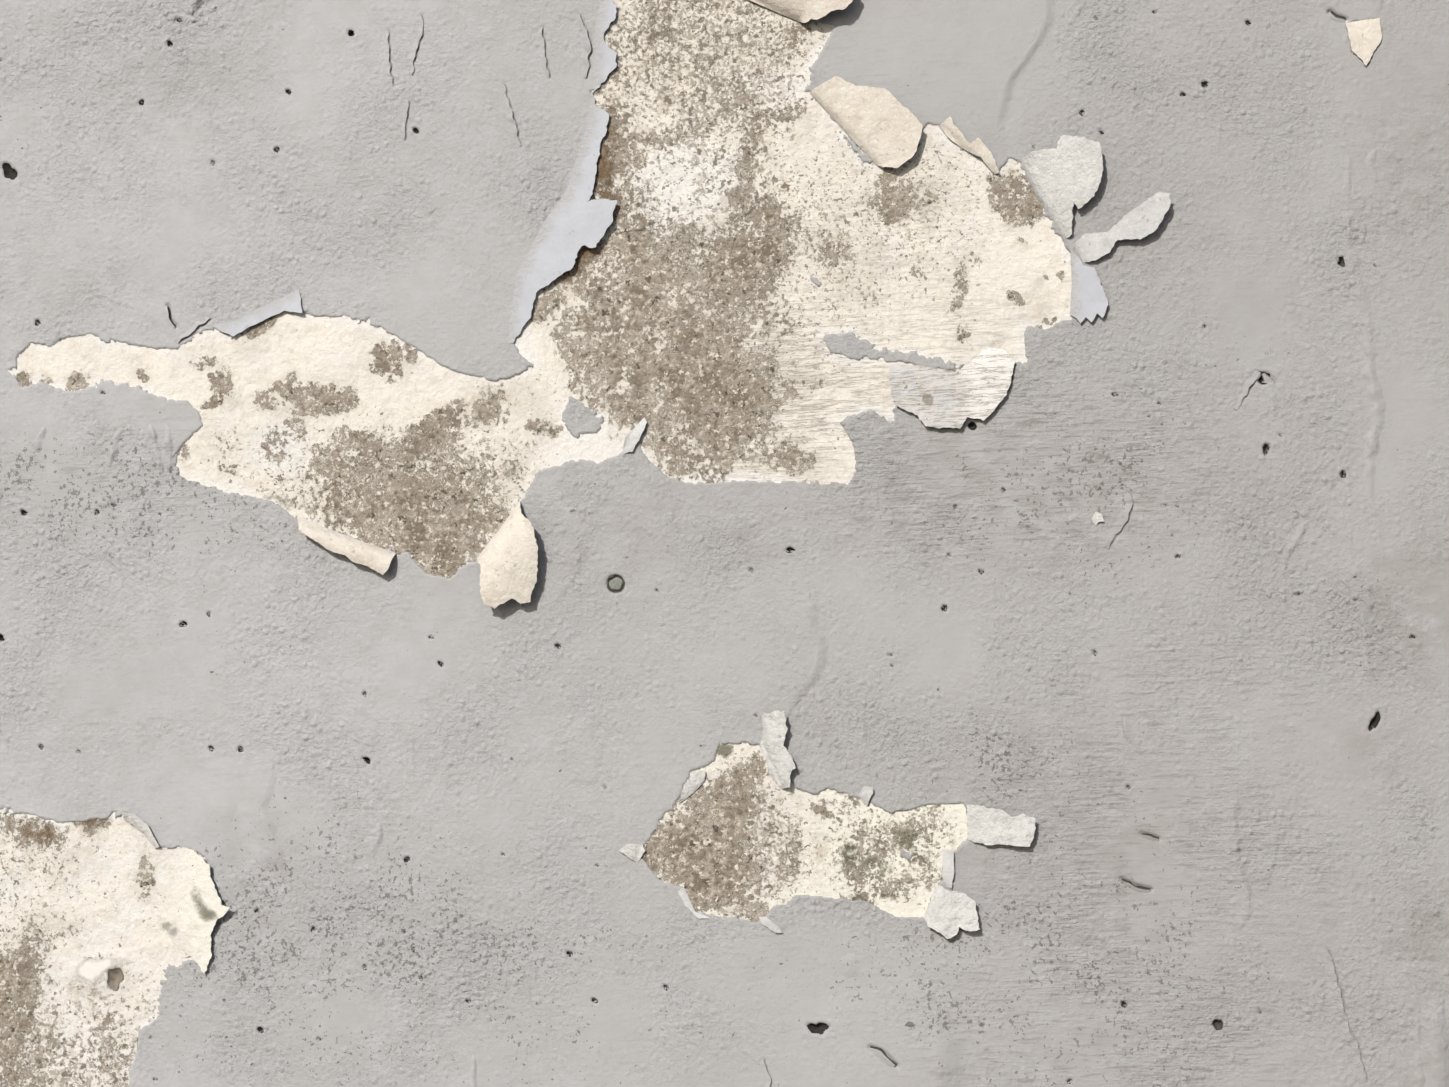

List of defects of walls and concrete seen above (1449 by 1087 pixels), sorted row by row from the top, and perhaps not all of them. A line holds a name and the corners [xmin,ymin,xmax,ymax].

peeling [1345,18,1382,65]
peeling [8,0,1171,609]
peeling [619,710,1036,939]
peeling [0,808,230,1087]
crack [869,1046,897,1068]